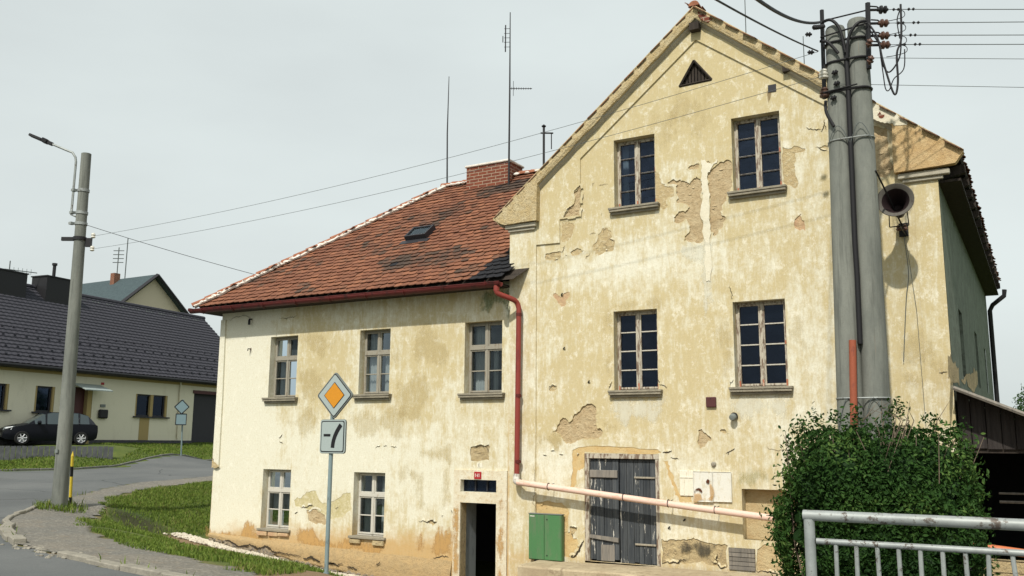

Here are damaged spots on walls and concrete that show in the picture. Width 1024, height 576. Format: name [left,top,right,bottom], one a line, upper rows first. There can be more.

peeling [782,144,805,188]
peeling [655,157,733,243]
peeling [543,183,615,261]
peeling [551,290,572,307]
peeling [948,354,978,393]
peeling [468,442,492,463]
peeling [553,400,692,502]
peeling [695,426,729,451]
peeling [294,490,352,526]
water stain [206,520,258,542]
water stain [297,529,381,553]
peeling [662,535,729,568]